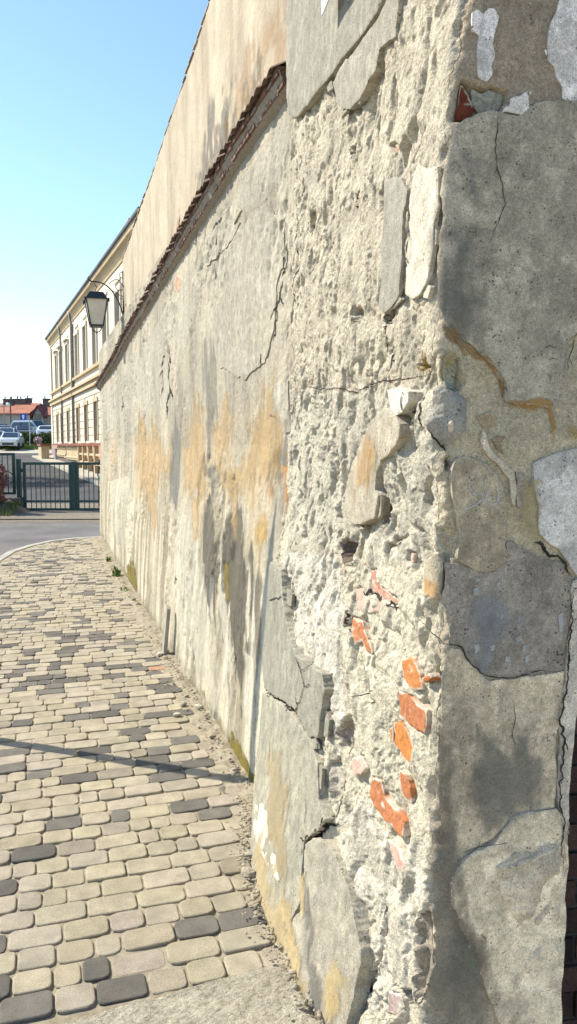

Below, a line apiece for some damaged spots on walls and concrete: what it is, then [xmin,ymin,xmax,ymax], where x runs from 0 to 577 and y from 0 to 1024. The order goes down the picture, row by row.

crack [491,122,506,239]
crack [270,228,299,341]
spalling [102,0,577,594]
crack [300,325,446,452]
water stain [169,419,180,505]
water stain [202,343,262,732]
crack [266,657,315,739]
flaking render [250,456,577,1024]
crack [300,801,339,880]